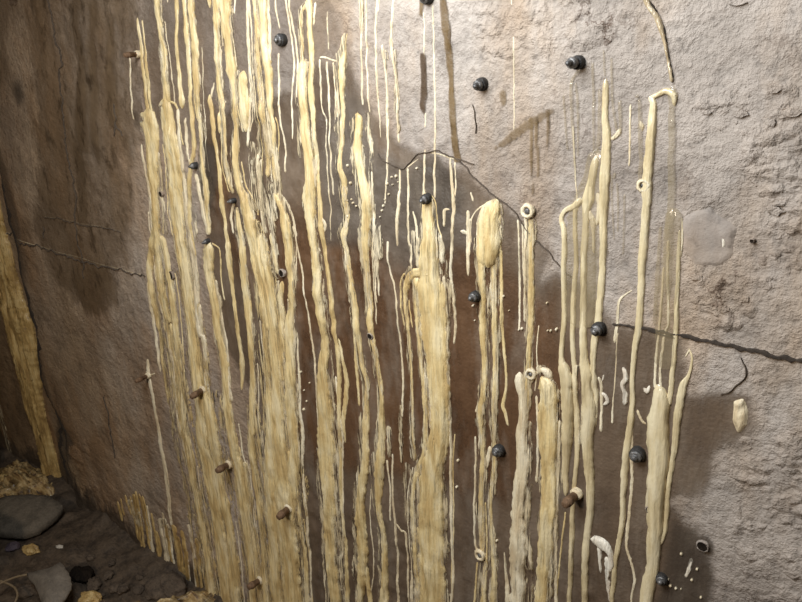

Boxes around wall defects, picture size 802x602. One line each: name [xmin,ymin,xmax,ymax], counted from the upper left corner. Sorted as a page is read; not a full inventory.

crack [643,0,674,82]
crack [1,0,145,476]
leakage [117,0,749,602]
crack [378,150,573,277]
crack [612,323,802,395]